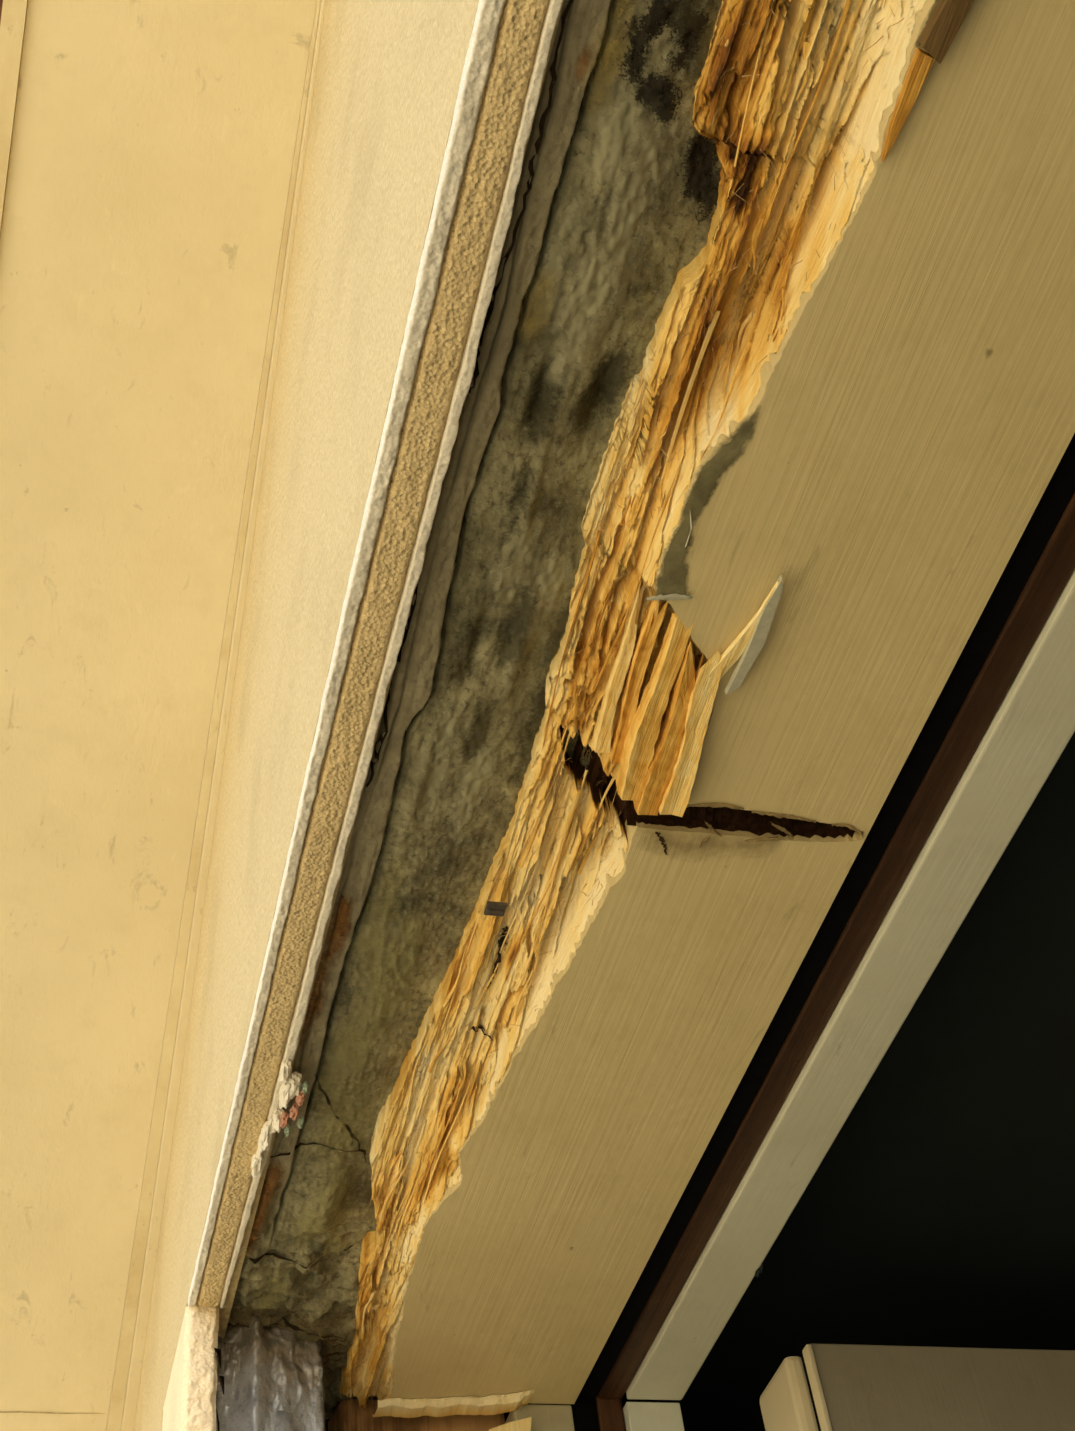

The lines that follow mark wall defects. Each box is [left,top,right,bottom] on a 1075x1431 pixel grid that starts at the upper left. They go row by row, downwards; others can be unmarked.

peeling [880,0,974,162]
damp [524,0,722,444]
peeling [646,414,757,601]
damp [494,469,571,778]
damp [421,701,494,837]
crack [626,800,863,855]